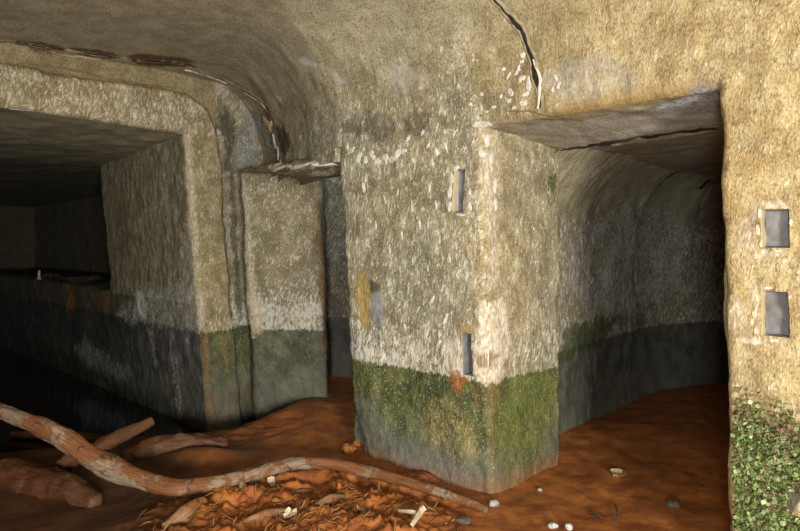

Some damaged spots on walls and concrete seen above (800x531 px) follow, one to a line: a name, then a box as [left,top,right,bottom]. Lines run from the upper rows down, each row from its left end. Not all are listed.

corrosion [16,40,116,59]
corrosion [129,54,193,67]
crack [490,0,718,151]
spalling [232,107,338,177]